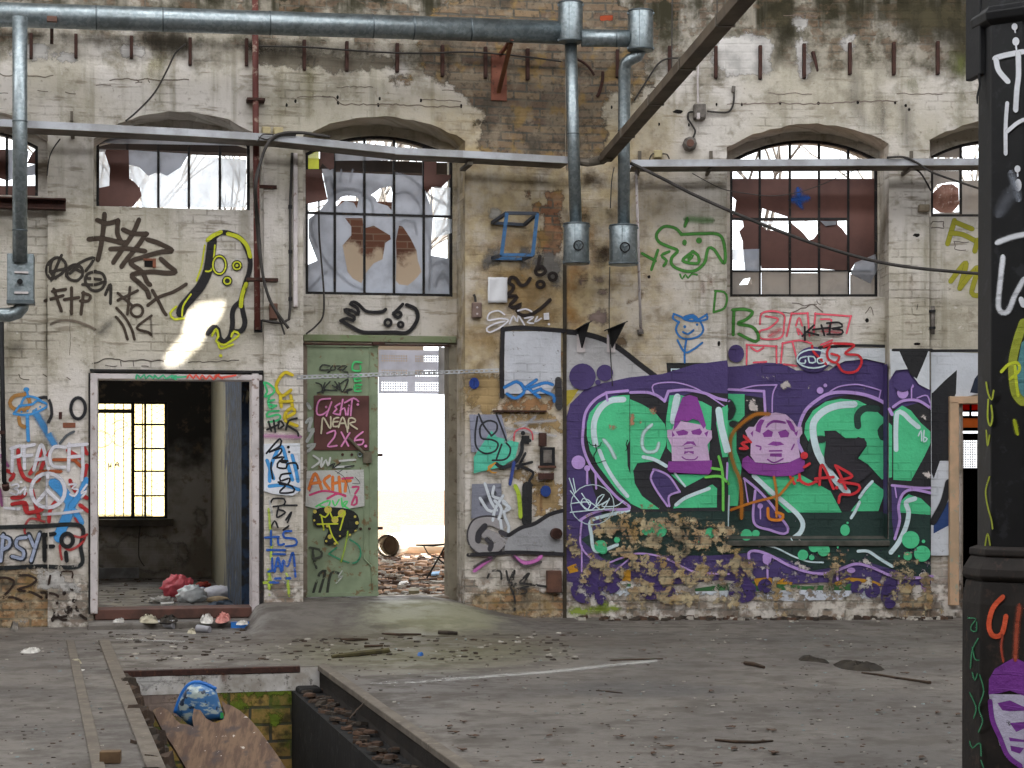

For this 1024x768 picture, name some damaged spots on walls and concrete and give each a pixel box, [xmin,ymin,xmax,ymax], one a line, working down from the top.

spalling [429,0,561,21]
spalling [580,0,629,30]
water stain [764,1,792,49]
water stain [845,0,966,71]
spalling [259,40,655,170]
spalling [520,190,564,288]
spalling [0,564,81,628]
peeling [566,504,798,617]
peeling [824,549,853,594]
peeling [891,552,944,617]